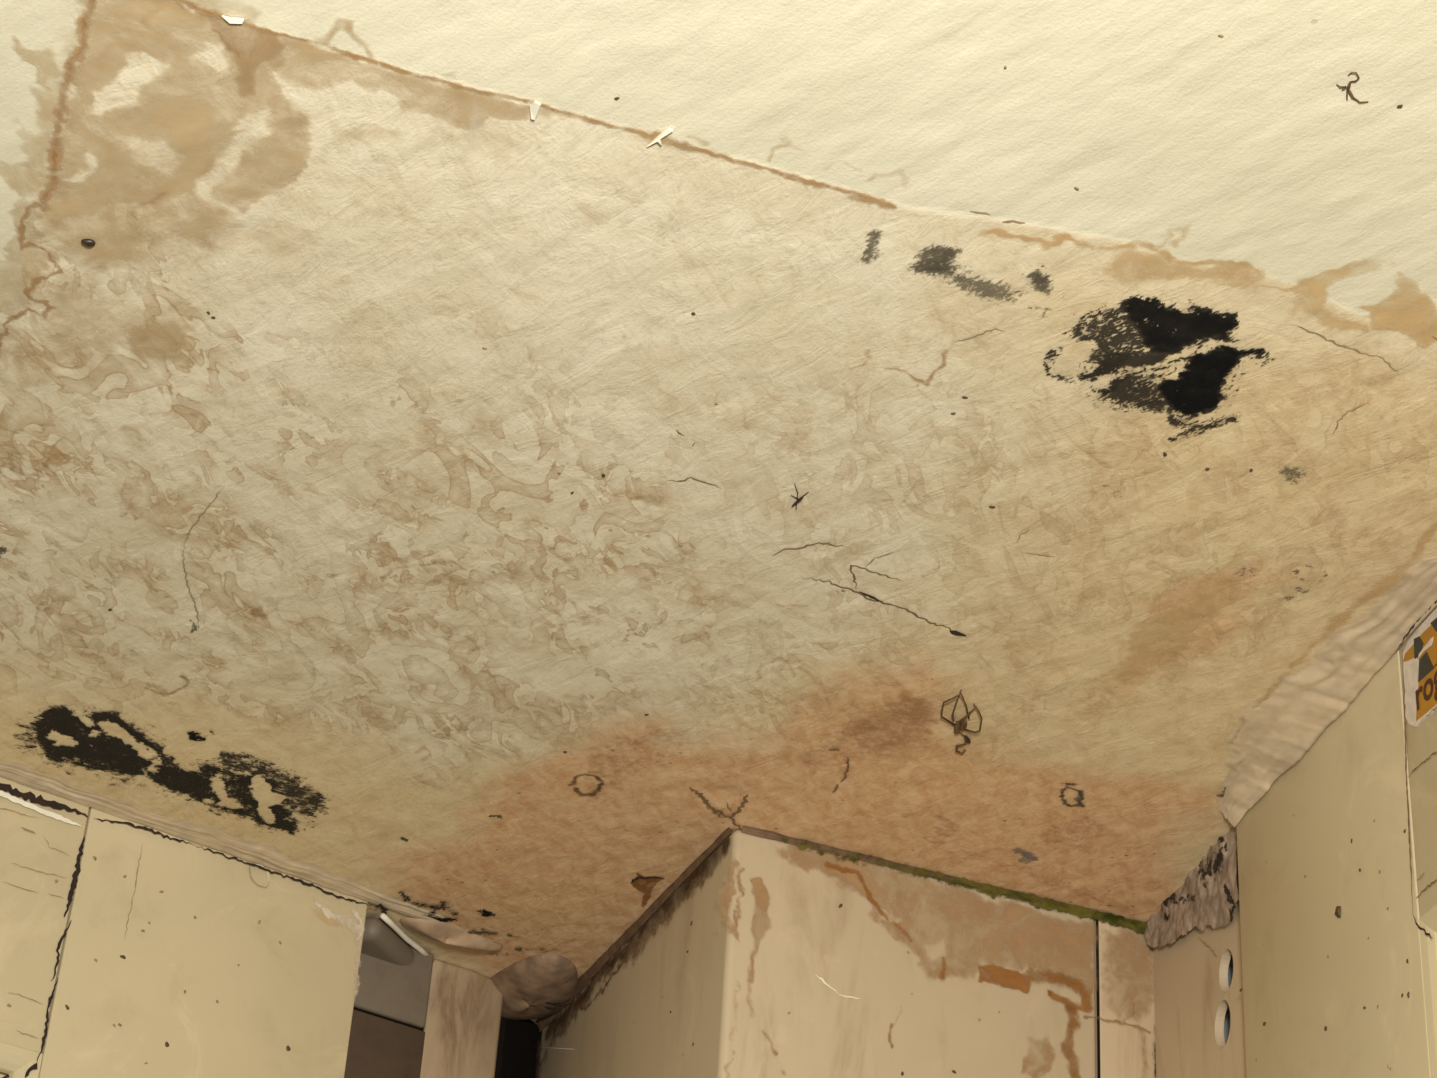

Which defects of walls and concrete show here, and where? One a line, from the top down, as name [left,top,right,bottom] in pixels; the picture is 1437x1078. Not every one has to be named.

leakage [12,0,352,268]
leakage [860,229,882,264]
leakage [909,244,1053,317]
leakage [1293,265,1437,348]
leakage [1043,295,1274,442]
crack [773,542,966,636]
leakage [13,705,331,835]
leakage [1059,783,1085,808]
leakage [1161,837,1235,922]
crack [0,783,388,1077]
leakage [398,891,557,963]
rust [786,846,1096,1078]